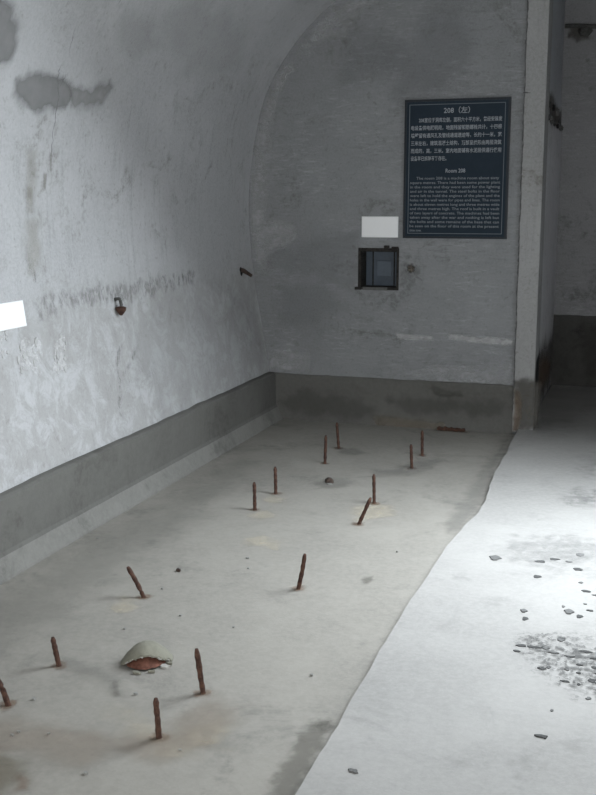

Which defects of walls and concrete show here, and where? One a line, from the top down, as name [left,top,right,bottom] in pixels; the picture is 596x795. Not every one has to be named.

damp [0,0,16,62]
damp [16,74,111,111]